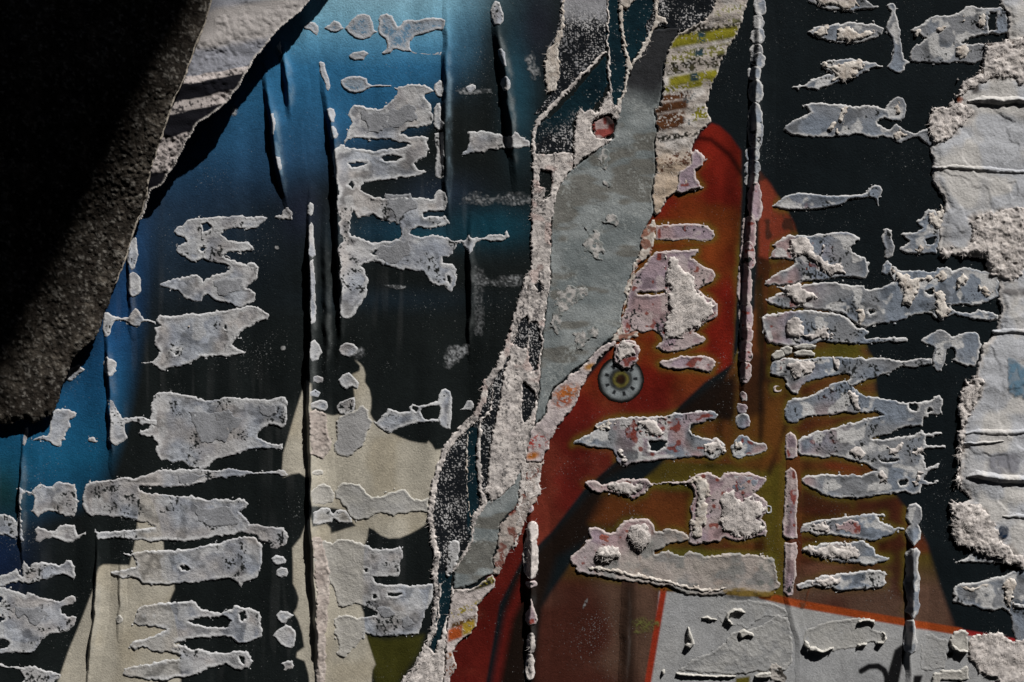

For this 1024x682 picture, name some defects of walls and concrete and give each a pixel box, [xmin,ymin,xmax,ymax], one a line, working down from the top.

peeling [490,1,504,25]
peeling [498,48,511,91]
peeling [462,130,530,157]
peeling [102,207,293,371]
peeling [570,0,1024,682]
peeling [65,365,85,382]
peeling [103,357,117,377]
peeling [522,480,539,681]